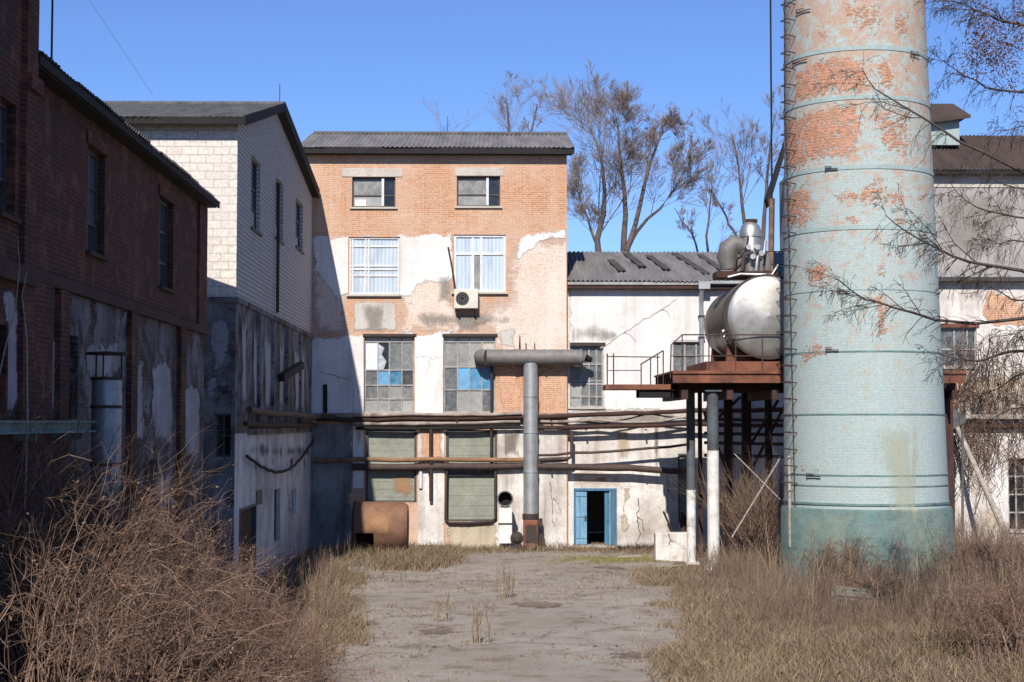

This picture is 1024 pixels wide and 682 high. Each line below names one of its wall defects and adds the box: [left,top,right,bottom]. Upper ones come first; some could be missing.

peeling [846,0,909,37]
peeling [785,56,912,230]
peeling [805,262,831,290]
damp [422,315,491,329]
crack [600,294,683,348]
peeling [875,295,892,341]
spalling [983,291,1024,332]
peeling [86,339,121,377]
peeling [137,320,231,456]
damp [242,324,304,419]
peeling [397,229,737,549]
peeling [800,344,830,364]